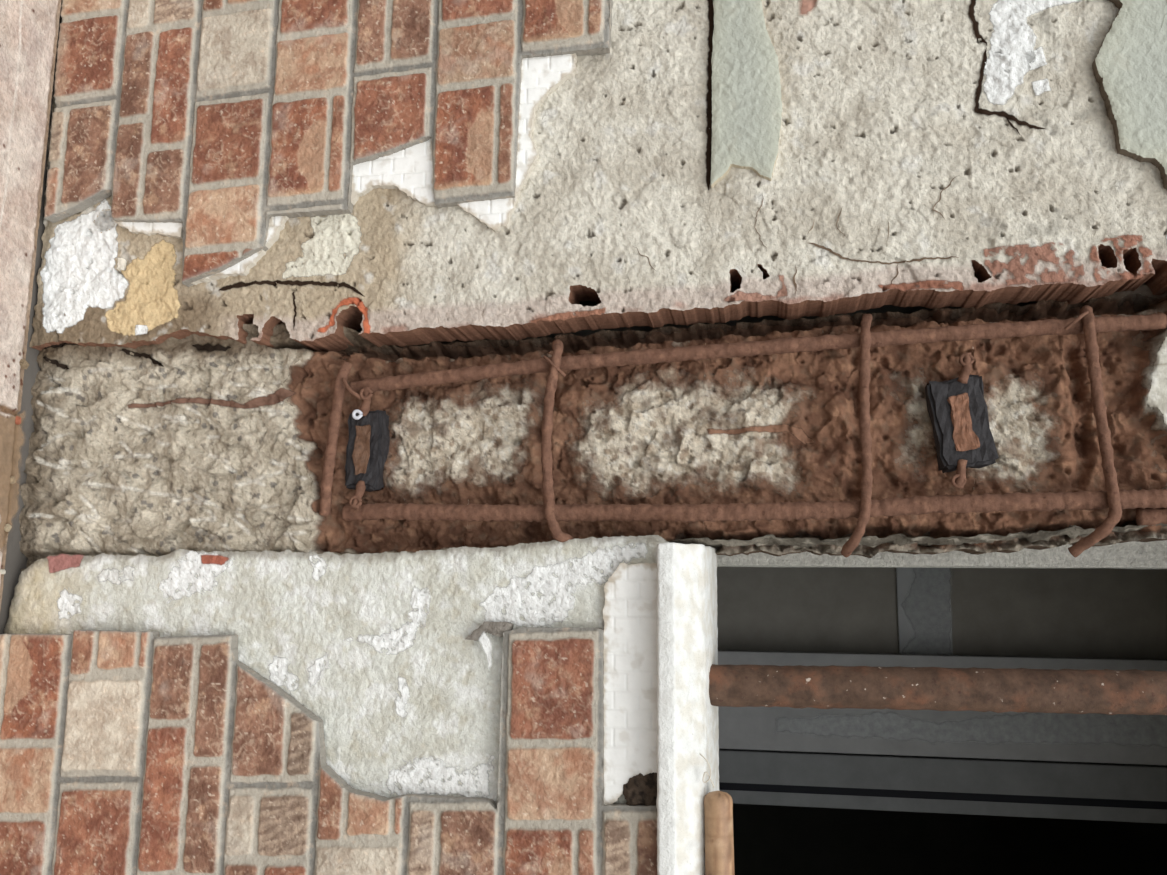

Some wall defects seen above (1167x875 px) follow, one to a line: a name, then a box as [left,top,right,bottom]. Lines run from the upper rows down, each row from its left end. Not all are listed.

crack [706,0,714,190]
peeling [711,0,782,188]
crack [968,0,1045,136]
peeling [984,0,1080,105]
crack [43,343,78,369]
crack [121,349,164,367]
spalling [19,199,327,603]
crack [192,343,231,352]
spalling [385,385,544,495]
corrosion [127,297,1167,554]
spalling [572,367,812,499]
spalling [972,374,1057,490]